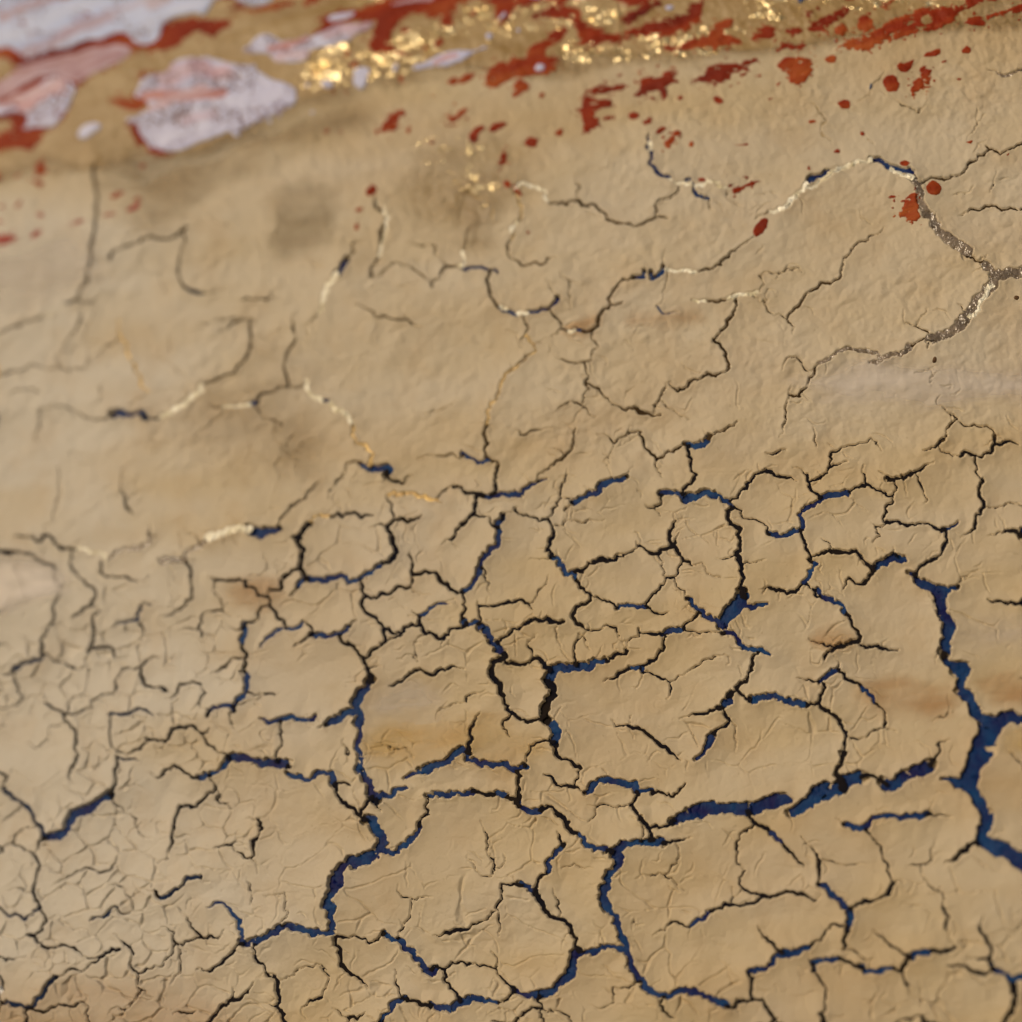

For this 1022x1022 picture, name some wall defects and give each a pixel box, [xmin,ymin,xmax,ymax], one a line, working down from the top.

peeling [126,57,297,152]
peeling [328,12,355,21]
peeling [413,46,487,70]
crack [989,69,1022,78]
crack [506,134,728,267]
crack [757,139,1022,427]
crack [924,408,1022,536]
crack [994,528,1022,538]
crack [0,166,957,1022]
crack [987,598,1022,606]
crack [946,916,1022,1022]